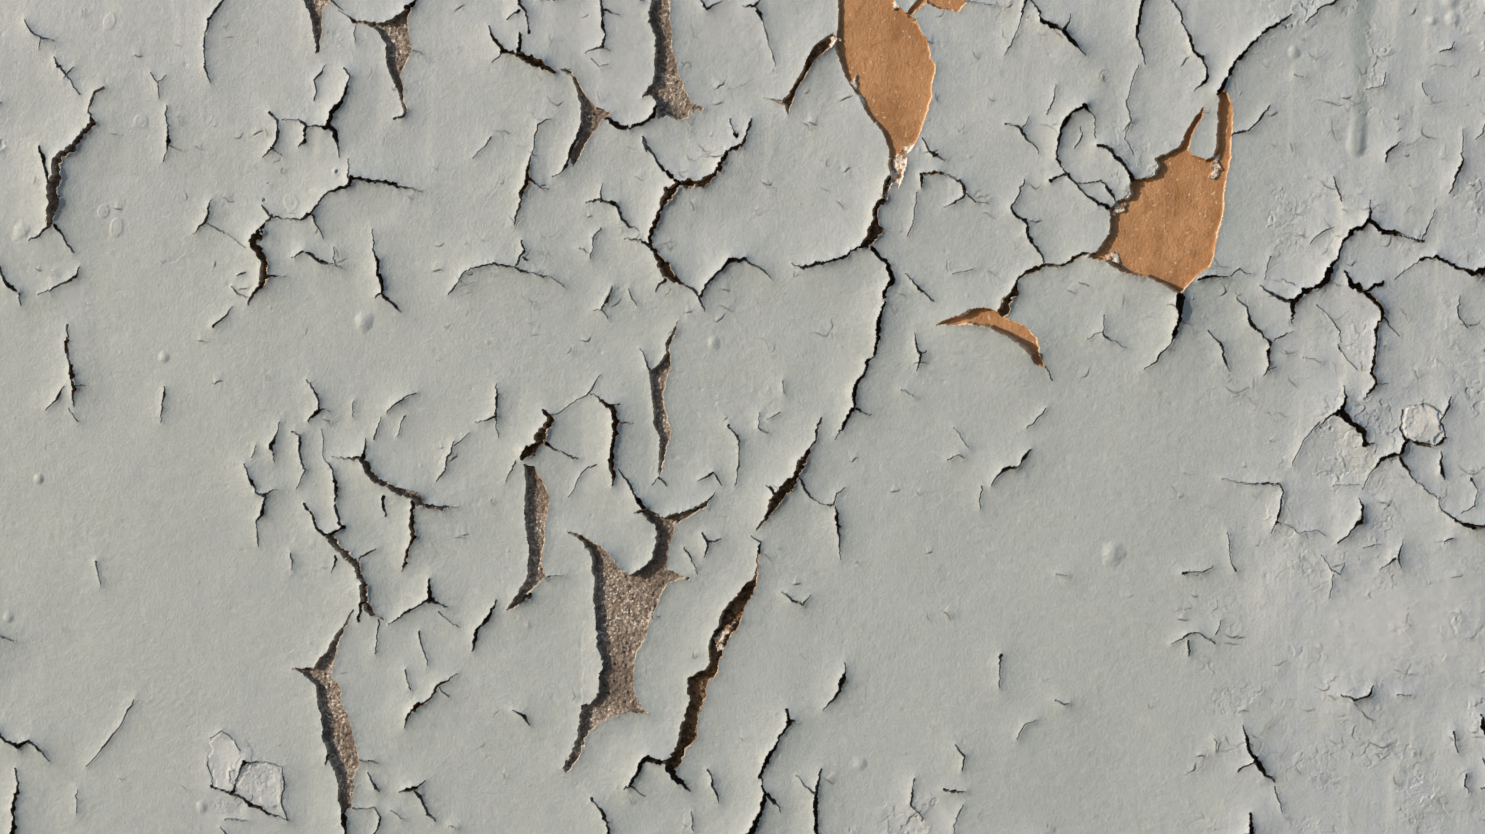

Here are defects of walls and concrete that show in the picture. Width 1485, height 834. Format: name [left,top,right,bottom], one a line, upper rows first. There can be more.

crack [192,64,424,328]
crack [240,379,418,571]
peeling [292,417,460,834]
crack [374,576,541,730]
peeling [485,0,706,178]
peeling [562,320,716,773]
peeling [618,535,764,799]
crack [691,662,852,834]
peeling [763,0,994,205]
crack [447,0,1359,560]
peeling [932,90,1239,381]
crack [1207,124,1485,600]